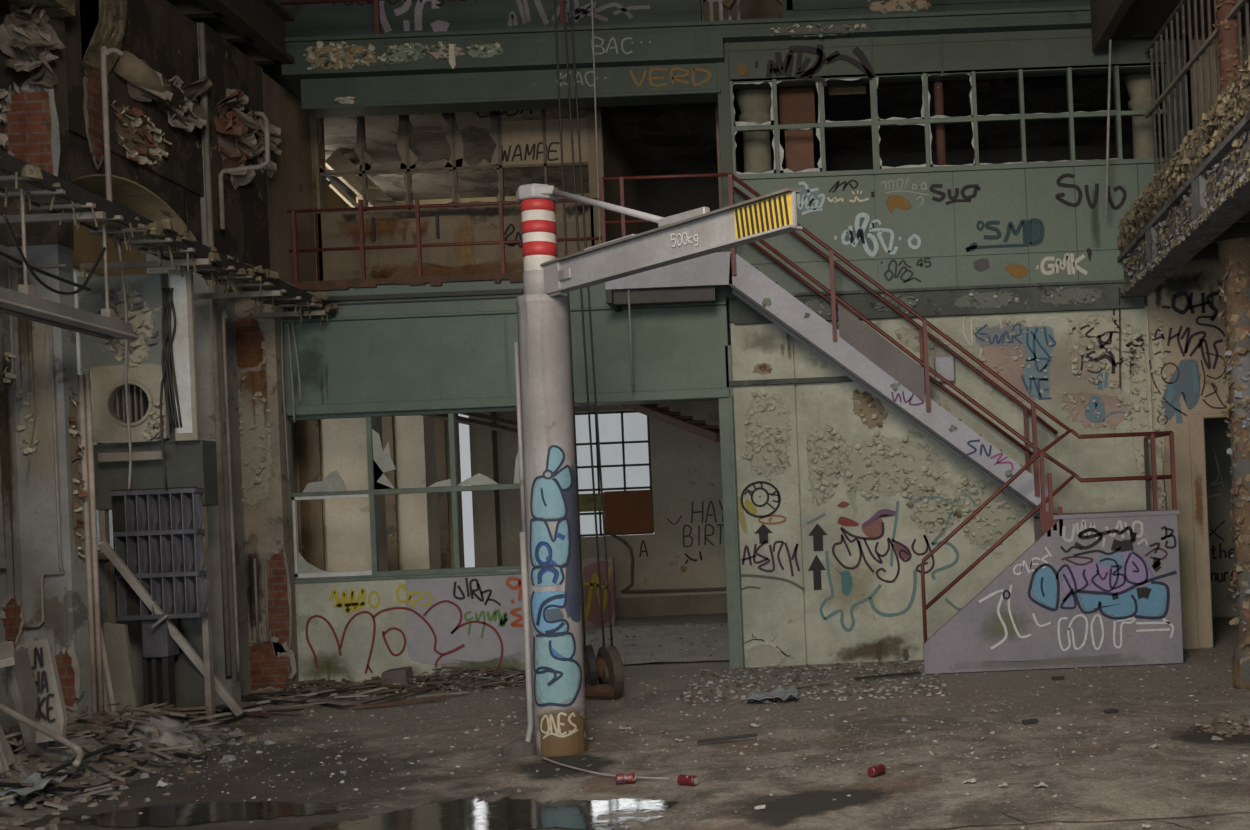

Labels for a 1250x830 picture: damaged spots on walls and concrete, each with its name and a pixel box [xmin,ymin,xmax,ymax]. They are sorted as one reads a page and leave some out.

spalling [0,4,66,177]
peeling [83,59,282,190]
peeling [807,390,1027,549]
peeling [1218,261,1250,650]
spalling [248,547,296,692]